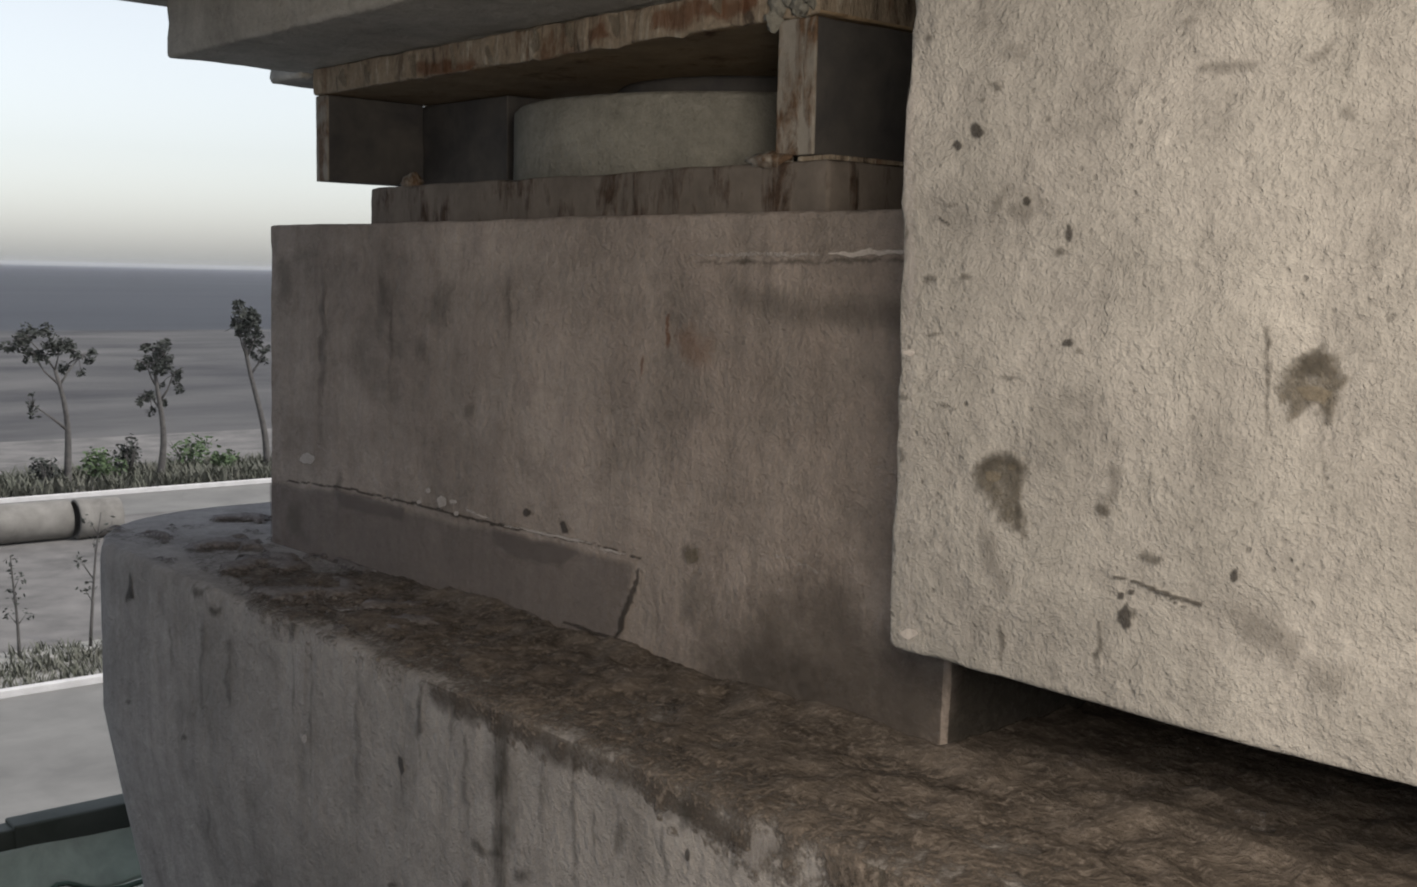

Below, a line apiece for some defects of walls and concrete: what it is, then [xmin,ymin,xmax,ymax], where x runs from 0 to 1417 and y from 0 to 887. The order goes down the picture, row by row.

damp [711,595,1087,744]